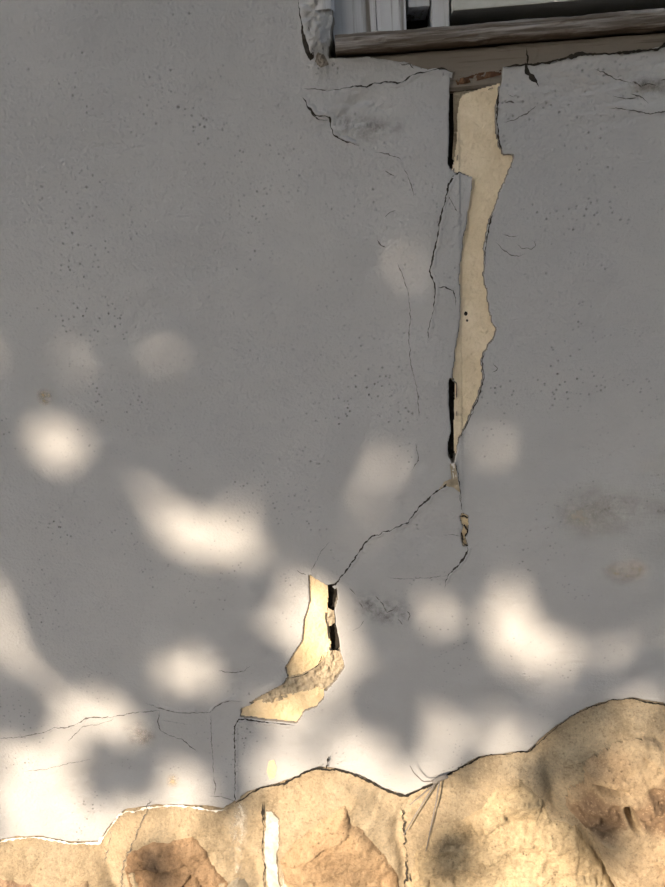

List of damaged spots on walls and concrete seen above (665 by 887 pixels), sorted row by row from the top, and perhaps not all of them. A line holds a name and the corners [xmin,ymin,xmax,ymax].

crack [298,0,329,67]
crack [302,63,453,146]
crack [506,43,665,114]
crack [398,172,465,418]
spalling [439,83,512,500]
crack [447,379,455,458]
crack [327,484,472,650]
spalling [241,575,344,721]